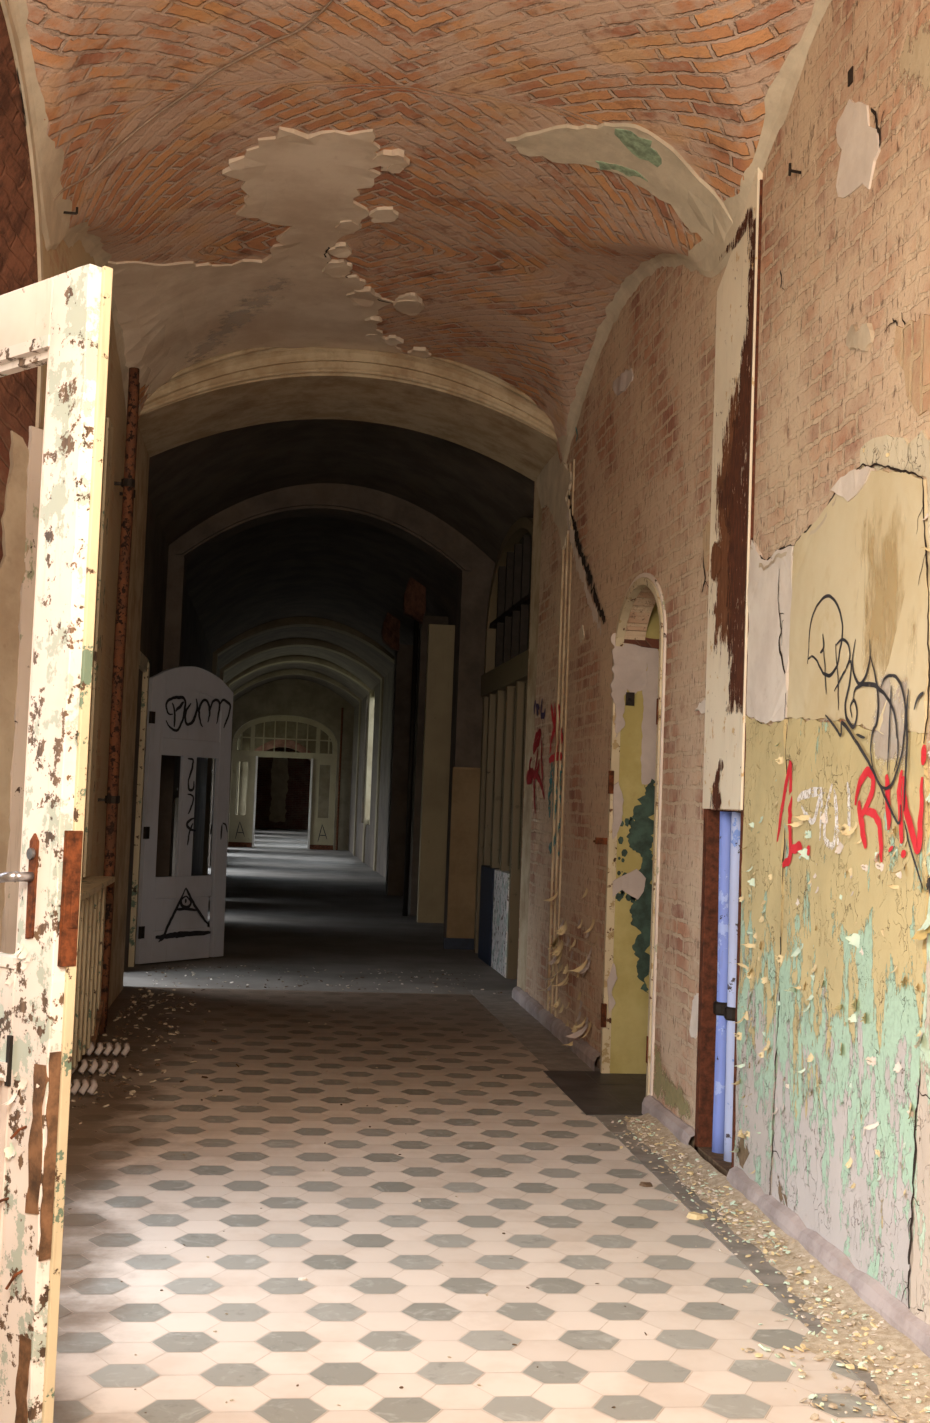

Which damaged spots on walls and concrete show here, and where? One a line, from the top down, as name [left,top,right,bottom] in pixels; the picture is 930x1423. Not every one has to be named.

spalling [0,0,44,282]
spalling [35,365,43,428]
peeling [108,126,431,399]
peeling [506,122,733,245]
spalling [860,314,930,593]
peeling [0,431,29,950]
peeling [730,540,930,1325]